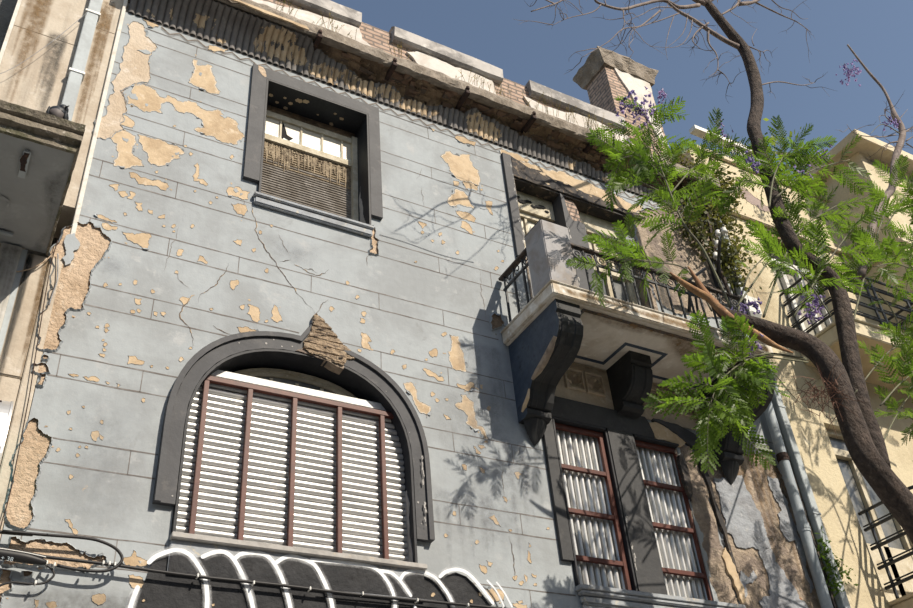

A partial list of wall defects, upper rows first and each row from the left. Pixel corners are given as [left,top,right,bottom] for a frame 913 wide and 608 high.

spalling [31,19,250,388]
crack [168,230,228,338]
crack [252,197,328,308]
spalling [265,306,373,375]
peeling [403,332,489,455]
spalling [312,40,727,319]
spalling [0,418,107,608]
spalling [649,418,821,608]